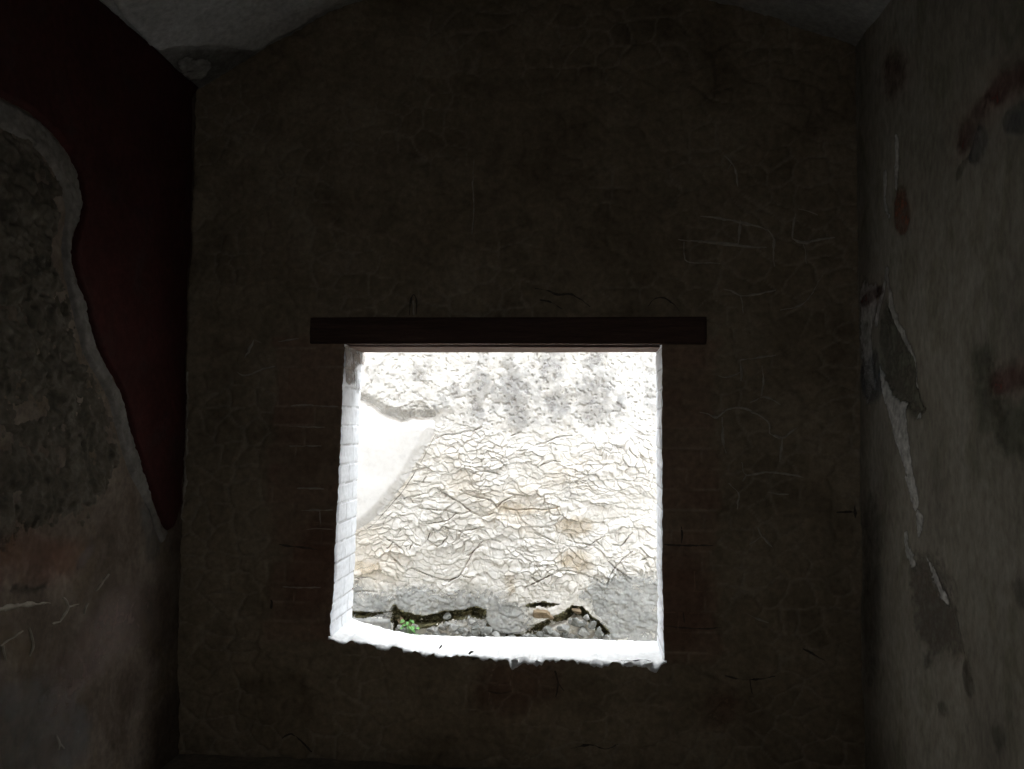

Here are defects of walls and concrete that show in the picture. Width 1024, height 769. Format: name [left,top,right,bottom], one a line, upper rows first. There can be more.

crack [362,427,713,585]
flaking render [860,267,949,604]